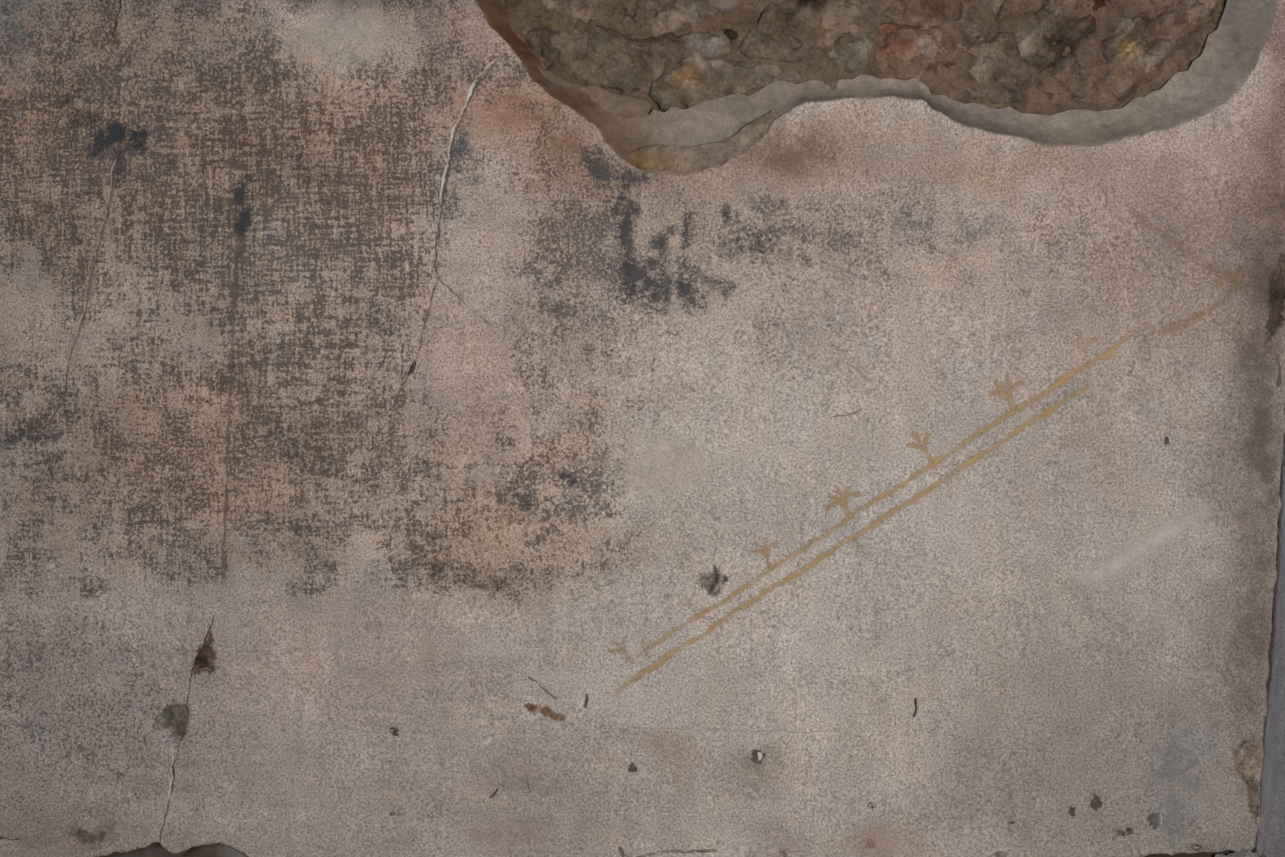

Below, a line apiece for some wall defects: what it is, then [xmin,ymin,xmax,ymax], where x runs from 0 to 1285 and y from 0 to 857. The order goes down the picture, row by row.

spalling [475,0,1278,174]
crack [49,152,122,425]
crack [390,59,526,410]
crack [159,616,214,844]